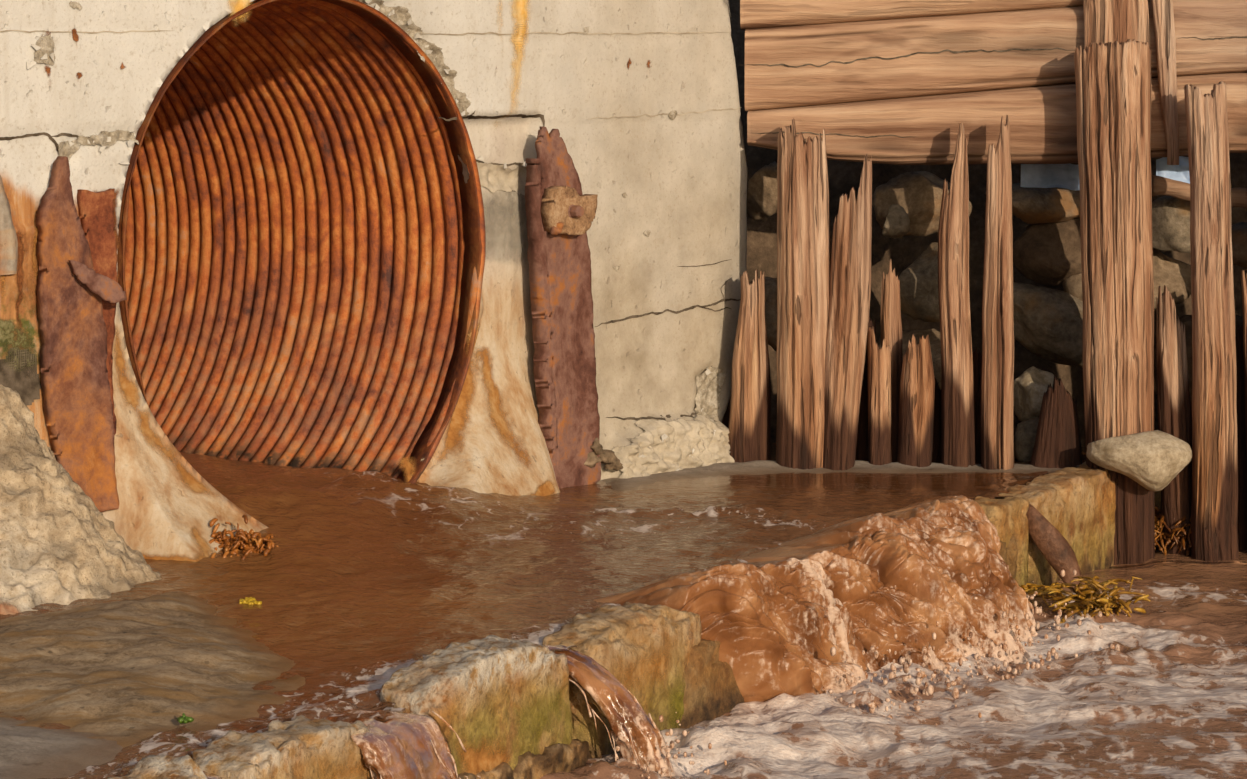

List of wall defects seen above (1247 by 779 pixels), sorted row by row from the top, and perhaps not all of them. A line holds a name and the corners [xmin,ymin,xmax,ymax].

rust [230,0,250,17]
spalling [358,0,471,117]
rust [512,0,528,91]
crack [595,259,741,327]
rust [115,332,207,493]
rust [440,326,531,466]